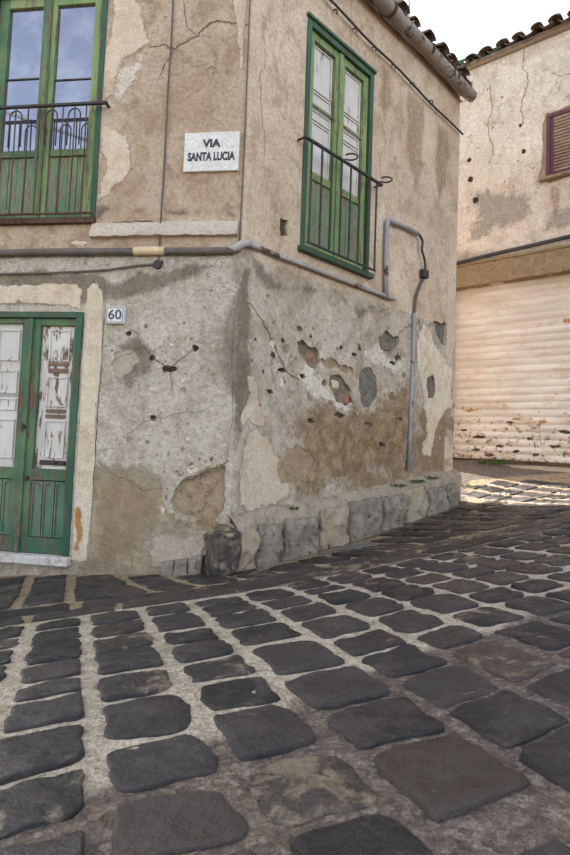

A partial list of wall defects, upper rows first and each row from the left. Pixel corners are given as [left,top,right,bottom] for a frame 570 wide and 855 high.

peeling [103,0,150,99]
crack [520,52,570,124]
peeling [98,125,131,201]
flaking render [111,321,204,422]
flaking render [157,454,226,529]
crack [89,276,307,561]
flaking render [276,426,323,485]
flaking render [240,321,407,428]
peeling [415,320,455,457]
peeling [461,429,519,457]